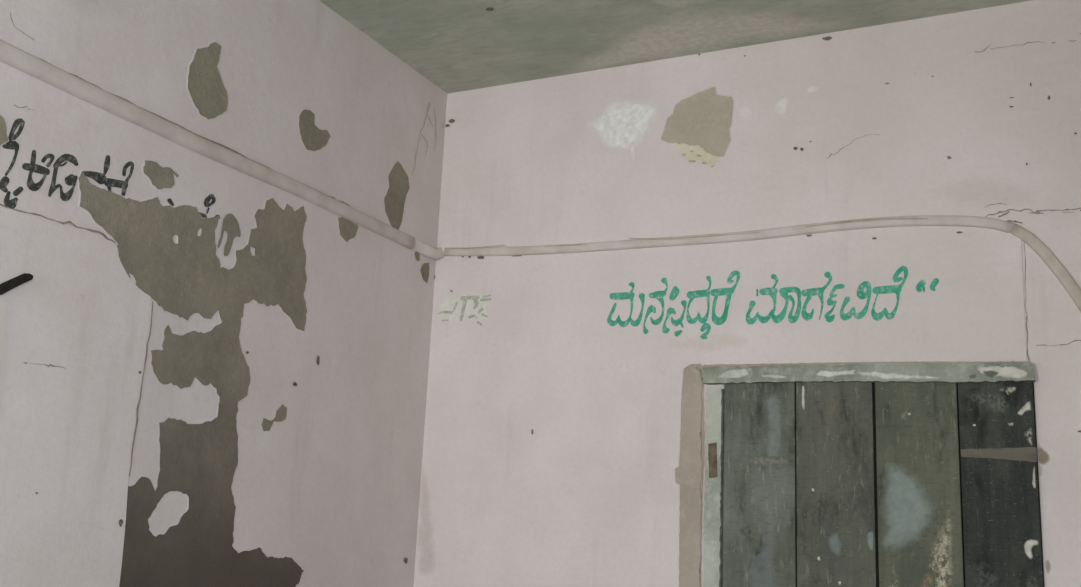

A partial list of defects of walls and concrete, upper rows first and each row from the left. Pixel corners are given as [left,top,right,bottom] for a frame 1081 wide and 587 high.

peeling [186,40,229,121]
peeling [297,108,331,153]
water stain [579,96,663,161]
flaking render [660,86,735,167]
peeling [337,216,359,244]
peeling [383,160,410,230]
flaking render [77,158,308,587]